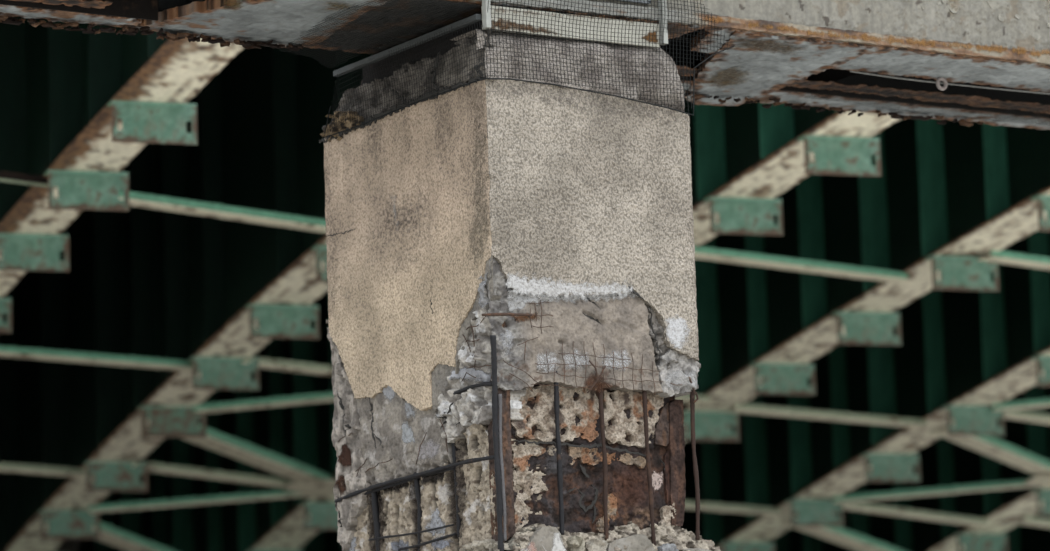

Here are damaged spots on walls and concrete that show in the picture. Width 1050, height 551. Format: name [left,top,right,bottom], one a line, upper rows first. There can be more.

rust [739,23,1050,56]
spalling [326,255,721,551]